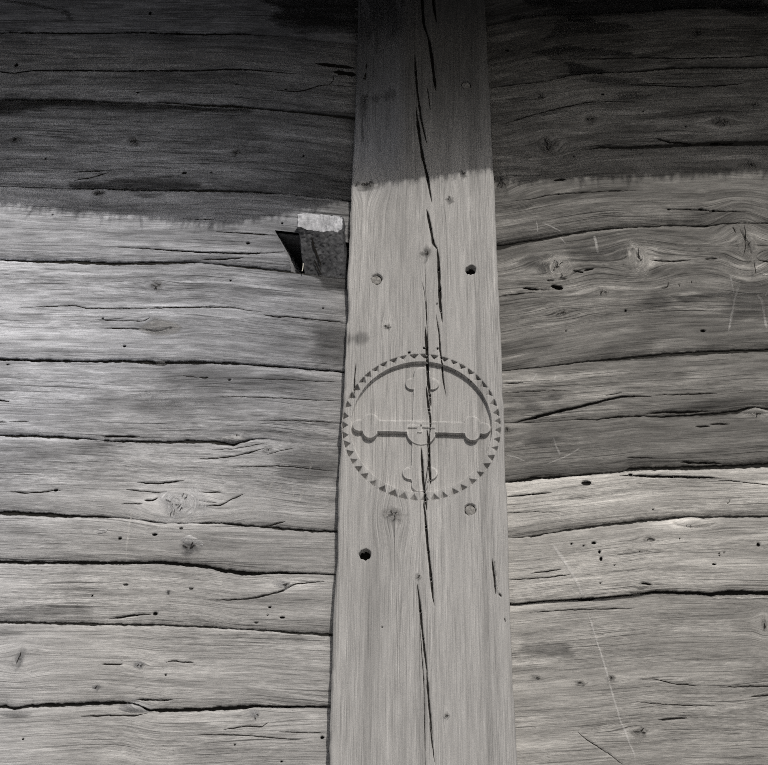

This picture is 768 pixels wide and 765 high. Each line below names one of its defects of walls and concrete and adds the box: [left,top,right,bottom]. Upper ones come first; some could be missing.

crack [414,0,450,765]
crack [492,560,569,597]
crack [540,597,632,612]